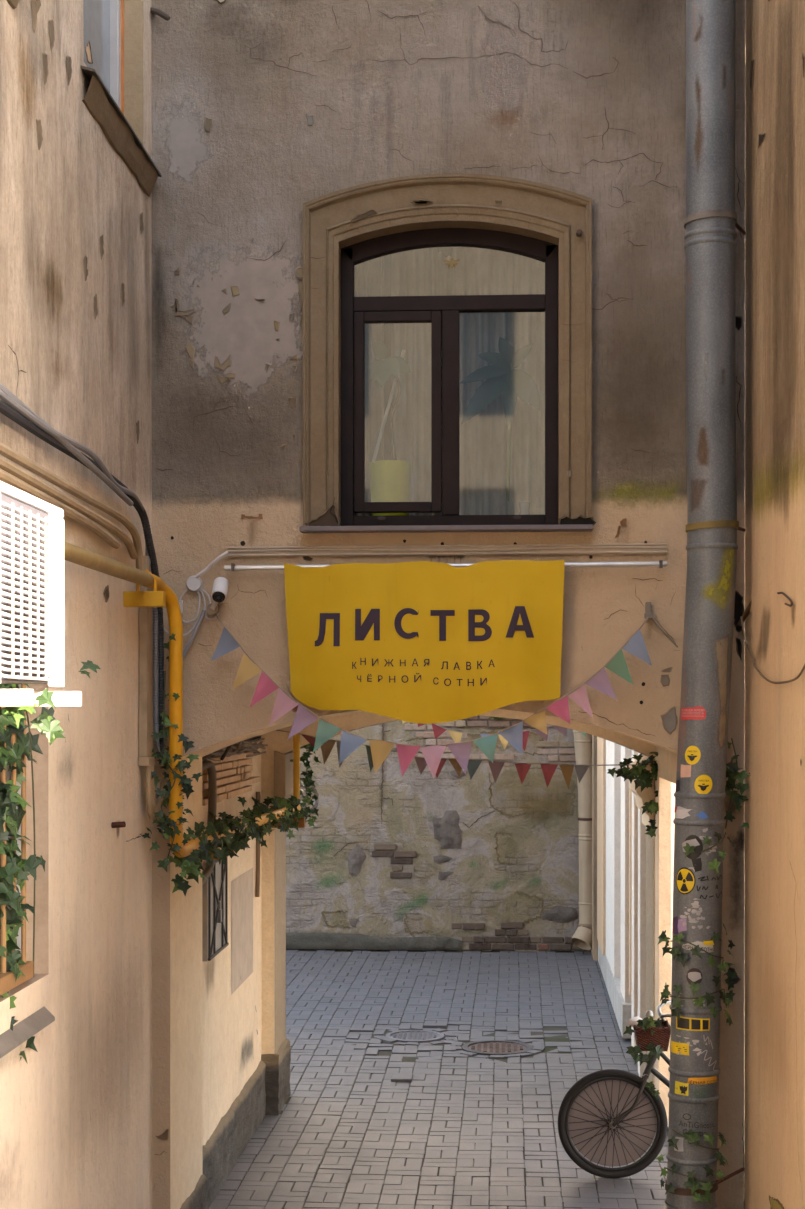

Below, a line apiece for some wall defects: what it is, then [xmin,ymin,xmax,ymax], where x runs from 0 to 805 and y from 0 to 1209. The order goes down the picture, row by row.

crack [246,0,619,79]
crack [464,109,674,246]
flaking render [347,840,417,887]
spalling [433,810,462,880]